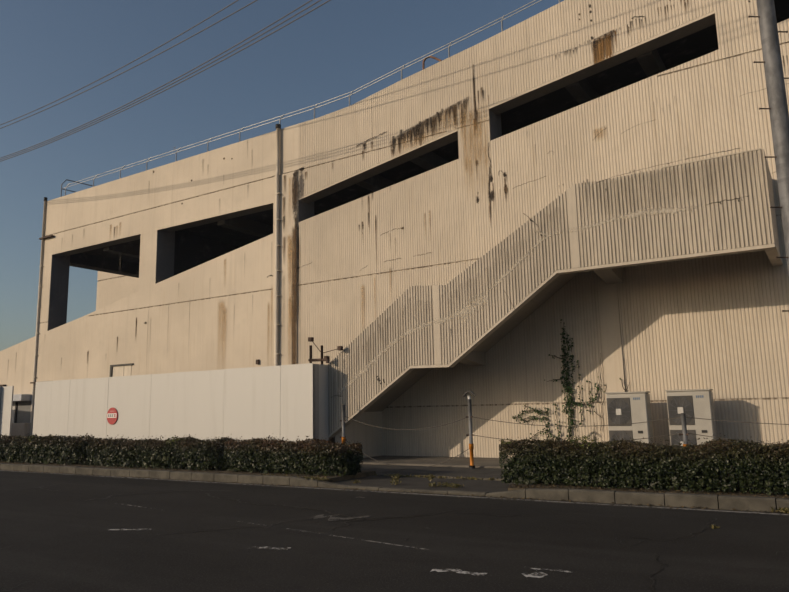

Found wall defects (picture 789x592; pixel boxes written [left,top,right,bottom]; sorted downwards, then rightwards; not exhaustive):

rust [591,30,616,64]
water stain [356,65,484,155]